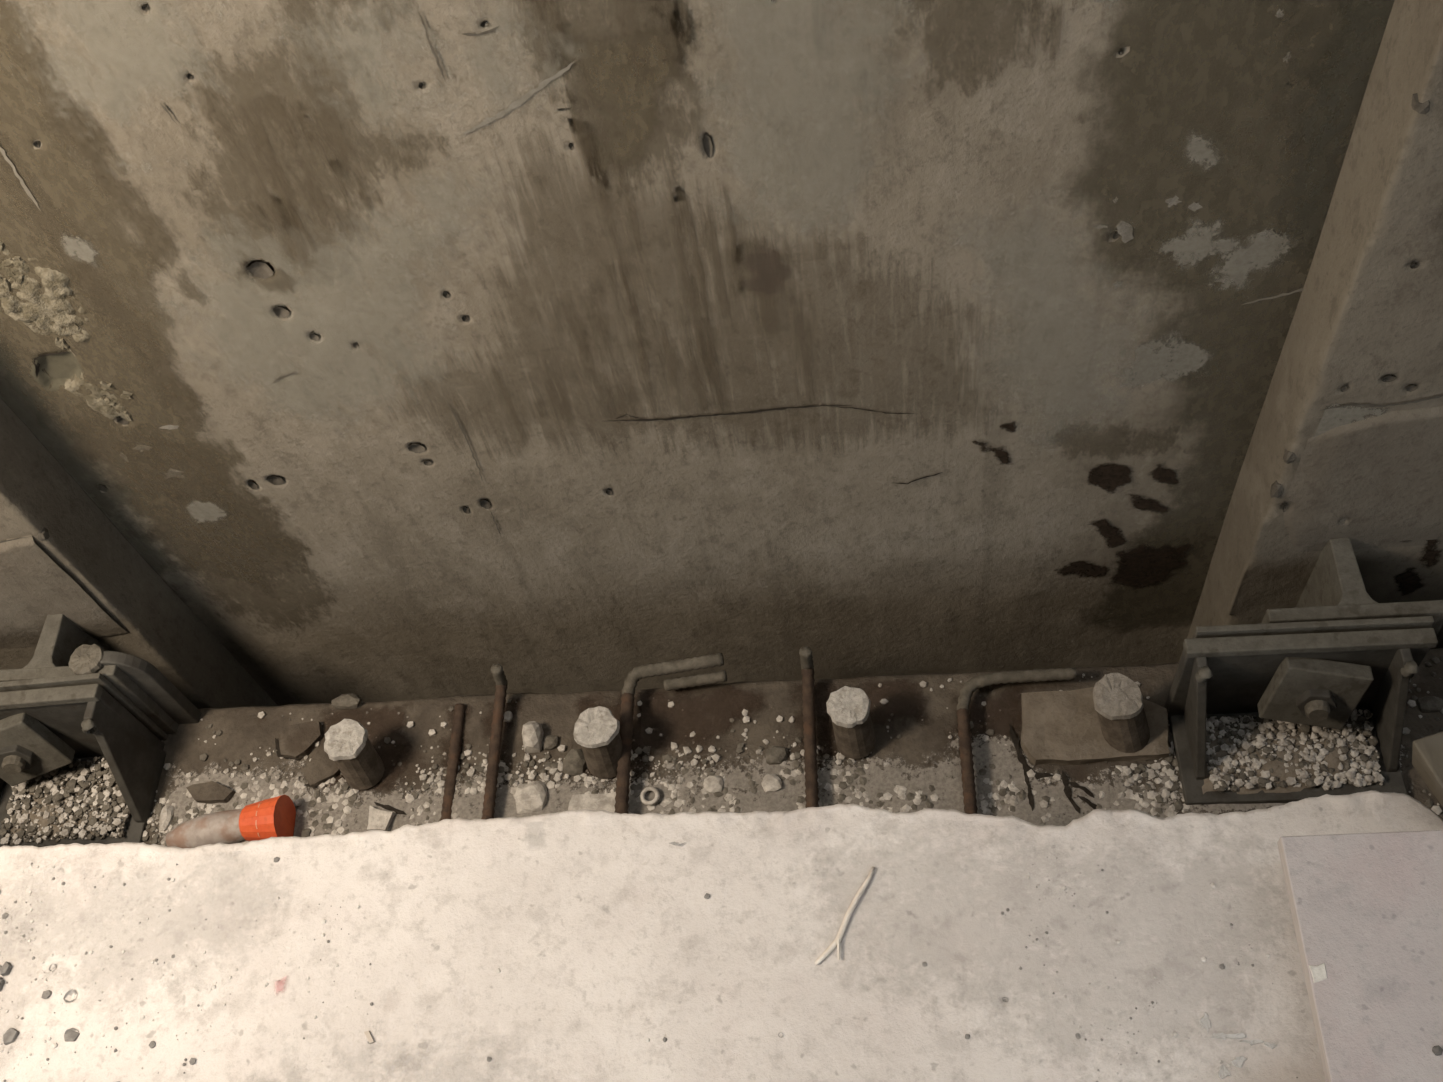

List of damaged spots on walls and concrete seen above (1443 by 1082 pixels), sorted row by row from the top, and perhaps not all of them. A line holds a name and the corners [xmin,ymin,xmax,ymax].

leakage [516,0,698,170]
leakage [195,0,428,291]
peeling [62,236,98,263]
peeling [1159,195,1296,289]
peeling [0,241,133,421]
leakage [0,0,329,626]
leakage [1054,0,1395,631]
crack [609,405,913,421]
rust [439,700,519,795]
rust [578,685,763,786]
rust [794,681,927,770]
rust [954,689,1022,747]